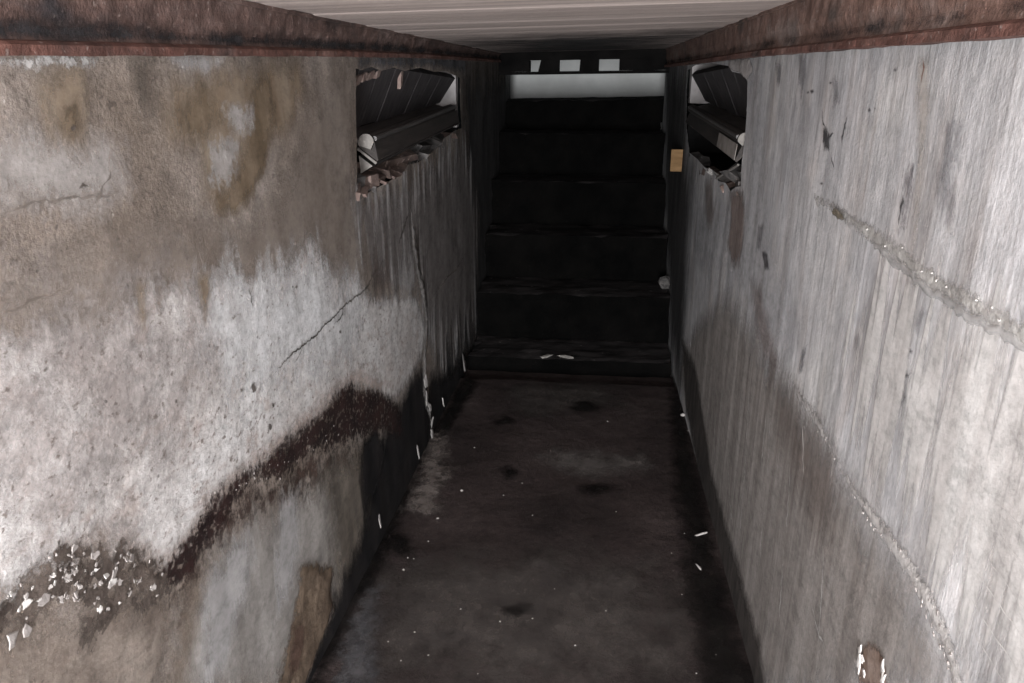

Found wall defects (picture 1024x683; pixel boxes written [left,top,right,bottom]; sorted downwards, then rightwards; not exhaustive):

spalling [356,70,381,86]
spalling [728,58,752,80]
crack [1,171,115,217]
spalling [355,132,458,201]
spalling [689,152,742,196]
crack [275,268,377,373]
water stain [0,57,693,683]
peeling [796,391,964,683]
peeling [0,535,173,653]